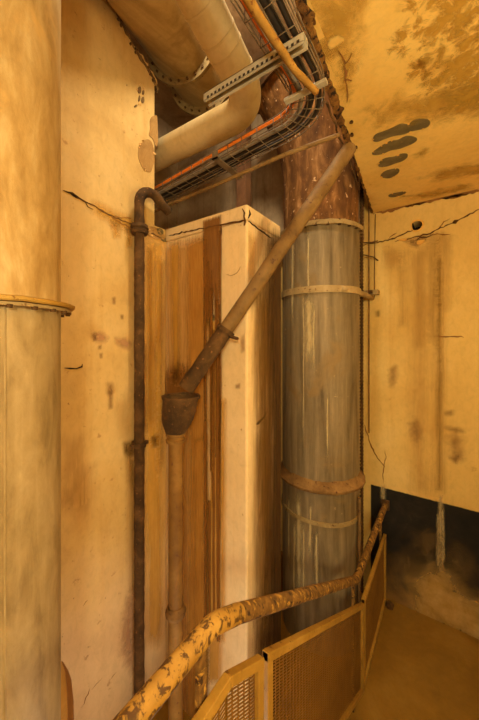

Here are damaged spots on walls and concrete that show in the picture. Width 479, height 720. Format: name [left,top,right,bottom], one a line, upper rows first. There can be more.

leakage [321,0,362,54]
peeling [138,116,158,172]
leakage [437,165,479,179]
crack [63,190,131,229]
crack [148,209,272,238]
crack [365,190,479,245]
corrosion [165,215,224,640]
crack [364,425,386,483]
corrosion [183,665,195,718]